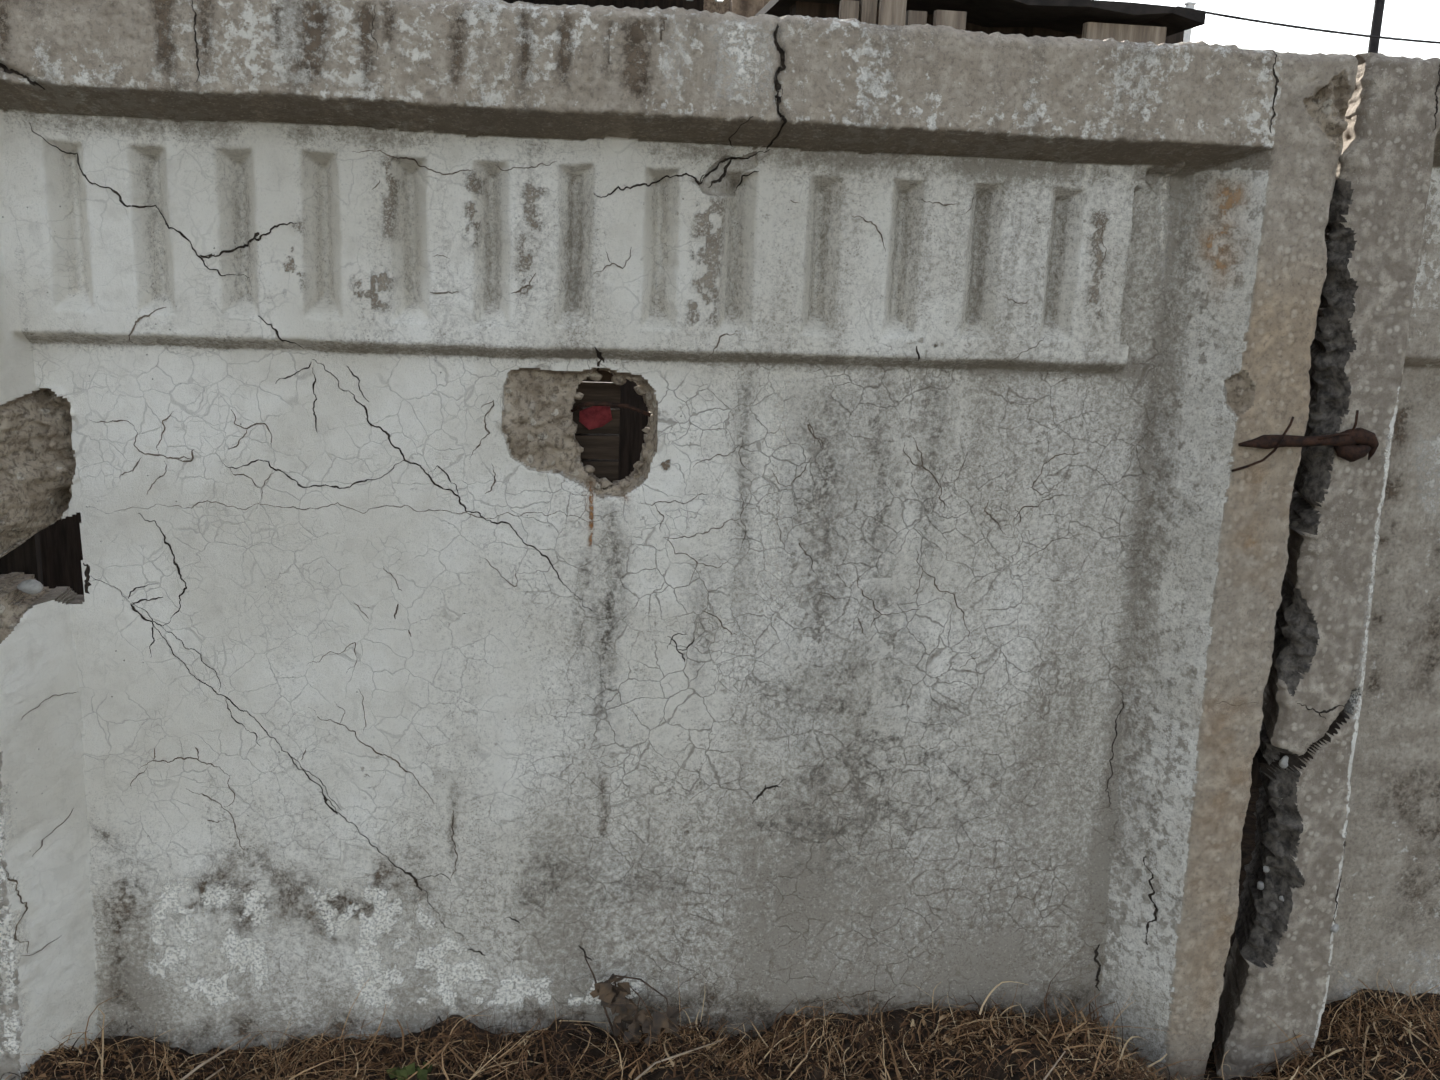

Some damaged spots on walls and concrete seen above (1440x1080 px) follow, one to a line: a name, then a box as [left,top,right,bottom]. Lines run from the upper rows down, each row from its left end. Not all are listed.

crack [594,24,787,198]
crack [1269,49,1279,133]
spalling [1303,69,1352,154]
crack [29,122,296,278]
spalling [502,367,670,498]
spalling [0,388,76,644]
crack [83,316,980,955]
water stain [599,515,621,704]
crack [1255,687,1361,779]
crack [1,808,74,956]
water stain [187,862,419,936]
crack [1143,856,1158,945]